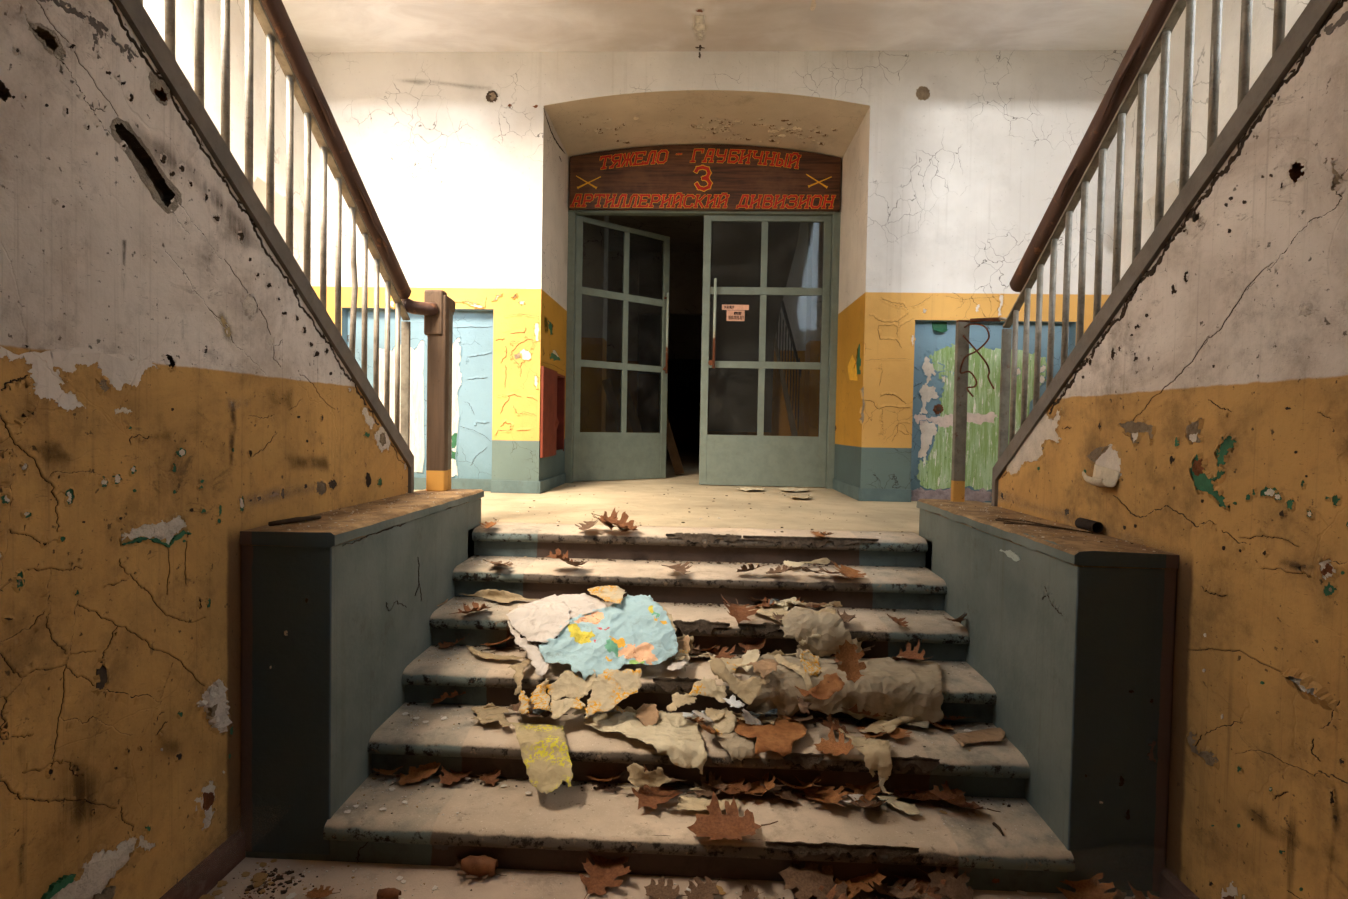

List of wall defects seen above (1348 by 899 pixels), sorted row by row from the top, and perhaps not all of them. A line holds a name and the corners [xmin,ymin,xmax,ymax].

spalling [0,80,29,102]
spalling [28,9,135,104]
spalling [148,70,171,106]
flaking render [109,117,221,224]
crack [1048,34,1316,414]
crack [1123,169,1348,443]
peeling [0,343,177,431]
peeling [910,322,1071,502]
peeling [116,477,285,549]
peeling [1169,417,1348,530]
crack [0,375,209,831]
peeling [41,823,158,899]